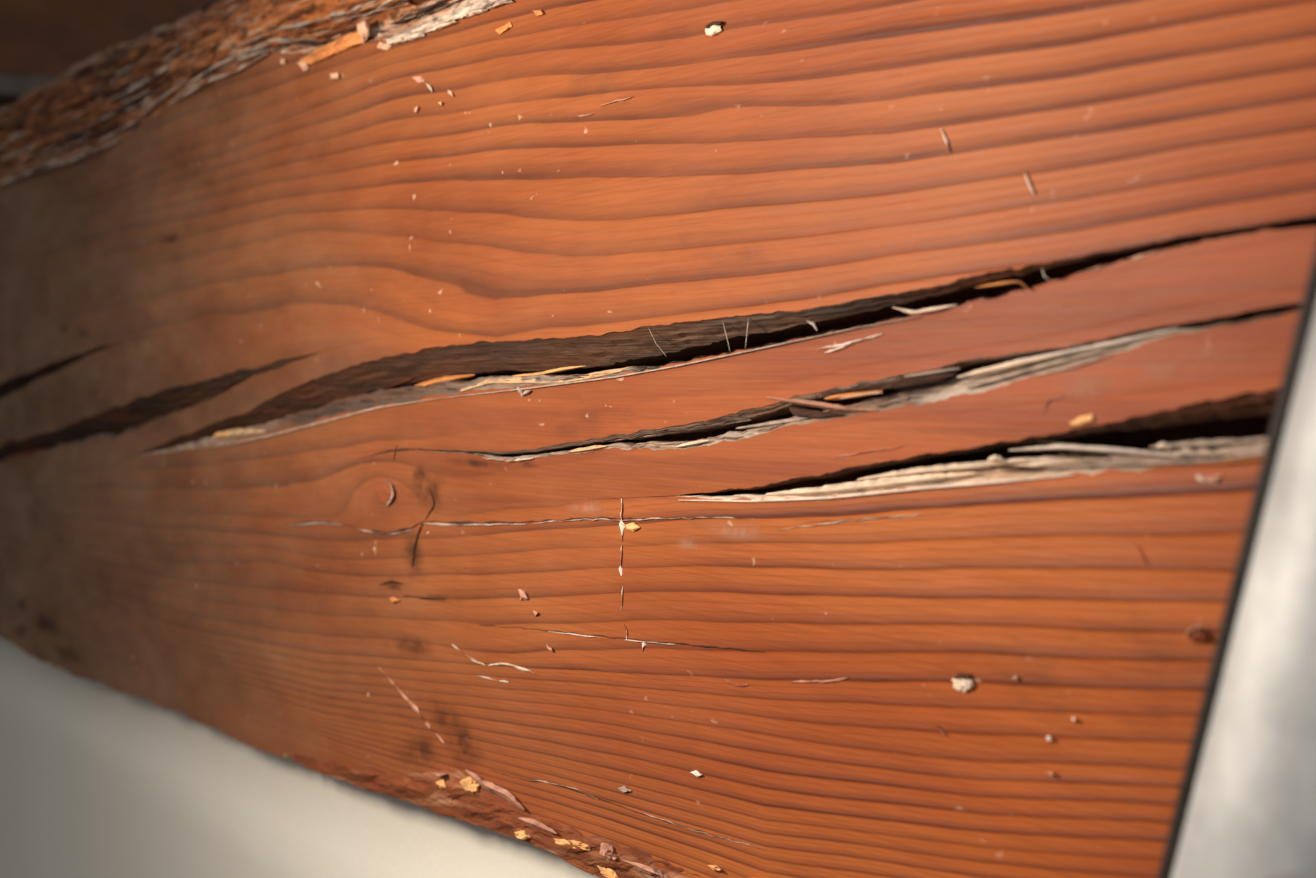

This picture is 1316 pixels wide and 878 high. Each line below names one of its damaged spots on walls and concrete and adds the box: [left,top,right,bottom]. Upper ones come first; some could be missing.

crack [0,215,1316,466]
crack [288,387,1280,600]